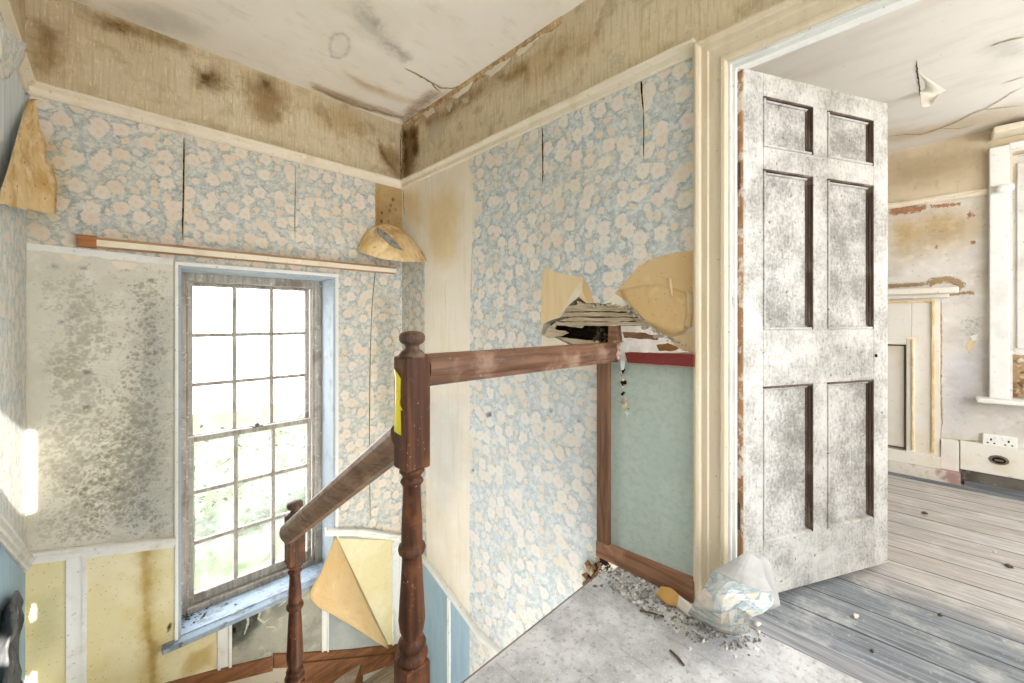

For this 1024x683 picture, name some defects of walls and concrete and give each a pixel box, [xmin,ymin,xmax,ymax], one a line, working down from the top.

crack [405,68,458,92]
spalling [403,16,562,127]
crack [895,77,1022,136]
flaking render [375,183,402,230]
spalling [889,202,976,219]
spalling [543,280,693,369]
damp [26,250,174,551]